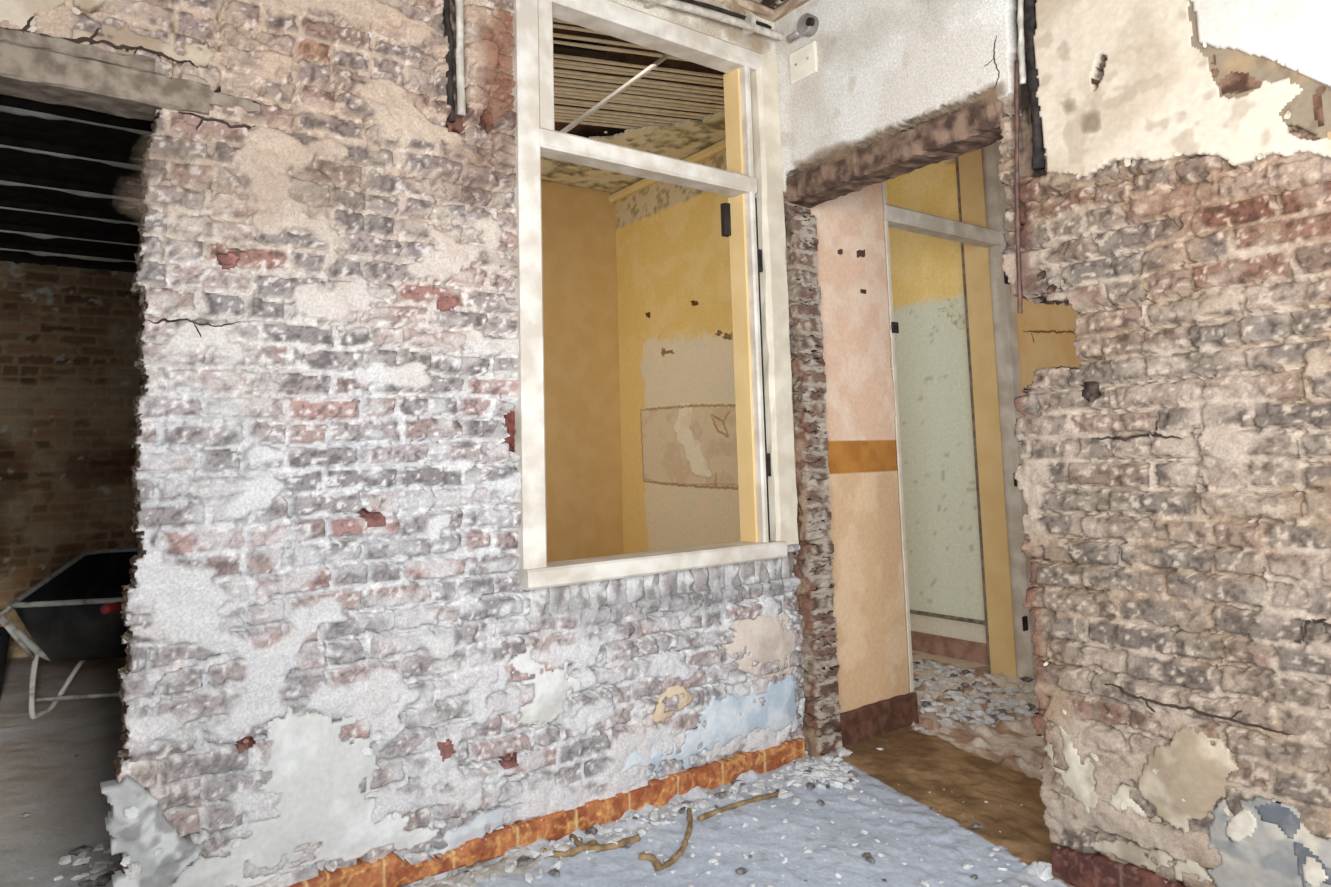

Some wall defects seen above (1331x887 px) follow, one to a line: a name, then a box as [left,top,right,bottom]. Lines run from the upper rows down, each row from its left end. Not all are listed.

crack [5,16,261,130]
flaking render [1033,0,1331,180]
flaking render [541,156,643,193]
flaking render [589,111,726,160]
spalling [503,411,516,452]
peeling [641,402,739,487]
spalling [357,508,386,528]
flaking render [510,644,581,730]
peeling [621,611,800,777]
flaking render [100,705,514,887]
spalling [498,752,519,769]
peeling [1041,709,1331,887]